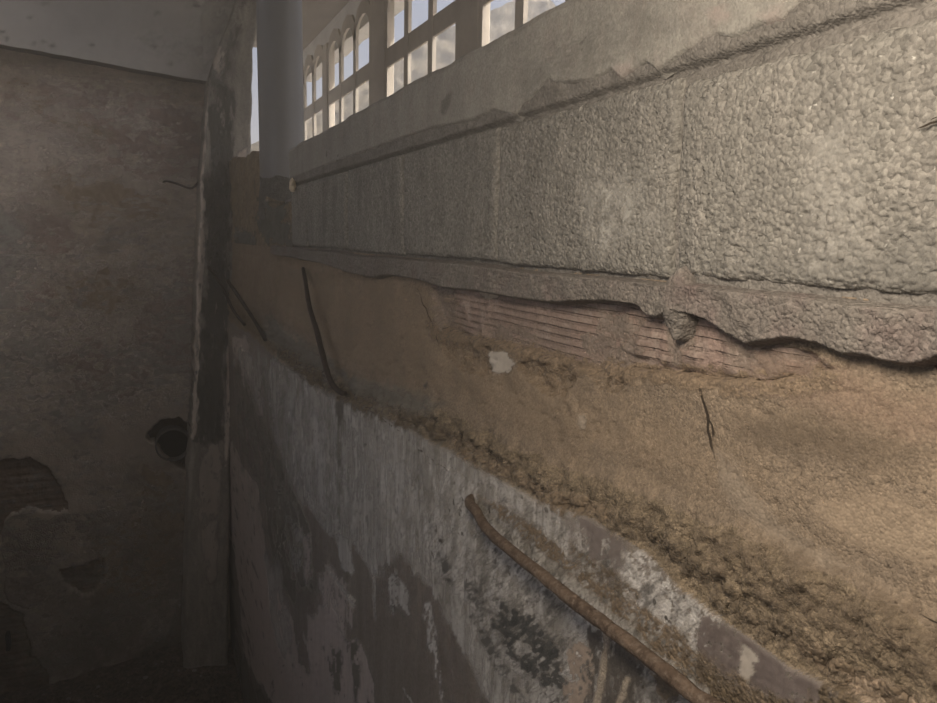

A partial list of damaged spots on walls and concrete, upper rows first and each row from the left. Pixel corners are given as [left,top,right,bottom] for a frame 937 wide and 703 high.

spalling [430,284,833,382]
crack [698,377,715,458]
spalling [0,457,69,535]
damp [262,315,912,703]
corrosion [480,500,794,703]
corrosion [805,682,862,703]